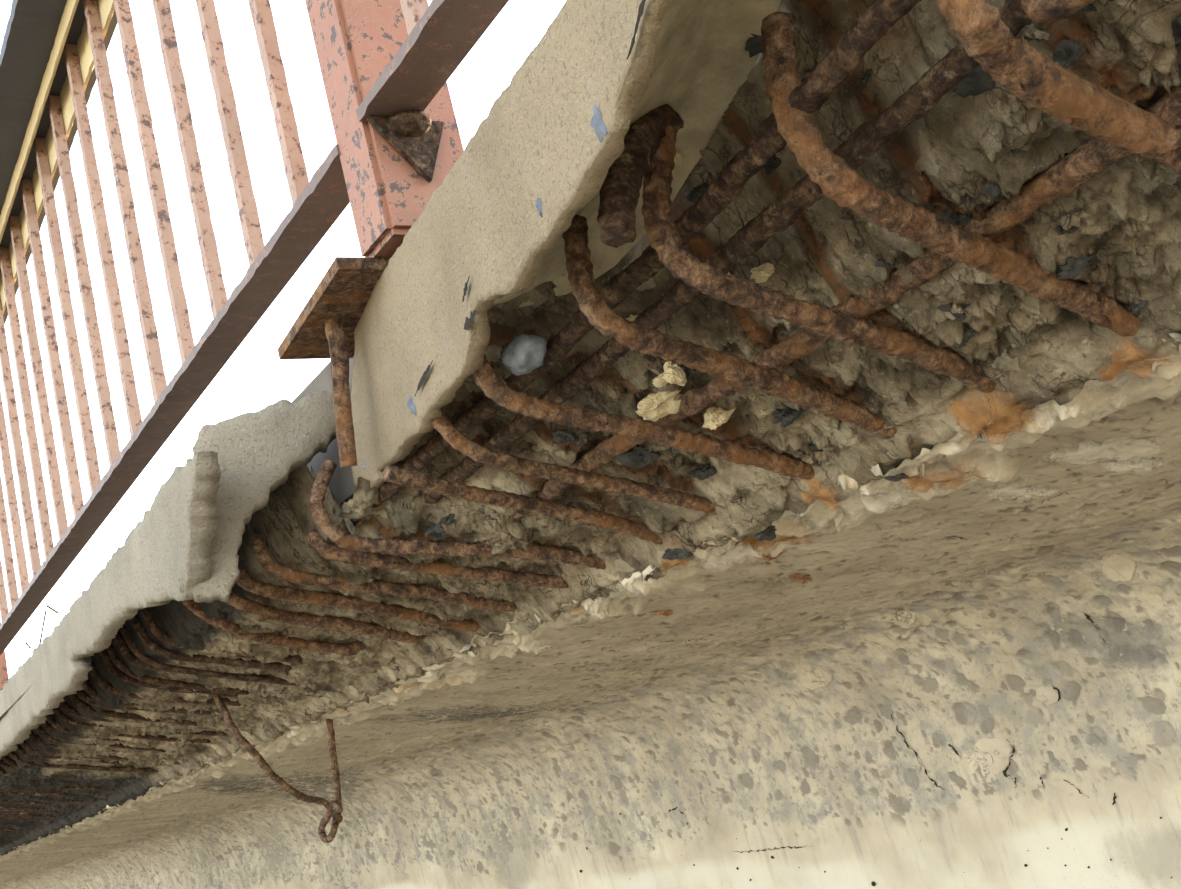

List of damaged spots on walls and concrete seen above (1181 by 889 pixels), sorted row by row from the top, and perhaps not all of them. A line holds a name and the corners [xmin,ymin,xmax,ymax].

spalling [484,0,1181,506]
rust [1100,344,1162,380]
rust [951,391,1033,444]
rust [906,470,981,492]
rust [738,535,808,562]
peeling [1102,553,1136,583]
spalling [0,354,817,856]
peeling [1036,685,1061,705]
peeling [959,737,1013,783]